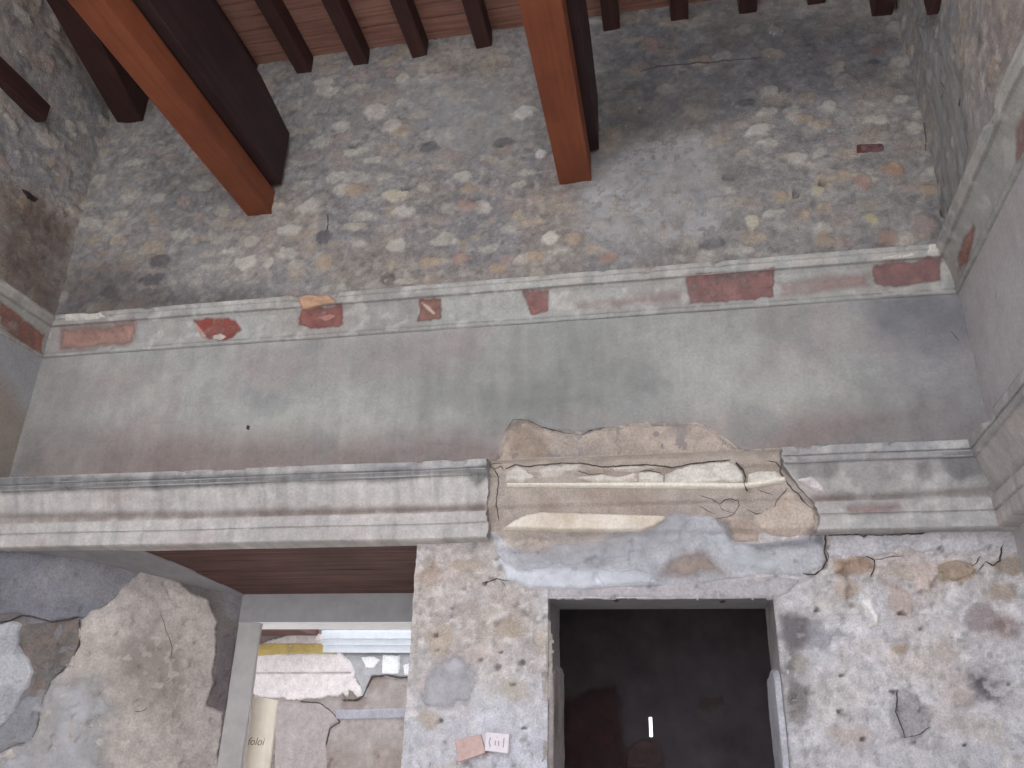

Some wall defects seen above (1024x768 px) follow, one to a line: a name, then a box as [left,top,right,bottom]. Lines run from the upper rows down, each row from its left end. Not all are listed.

spalling [499,421,781,483]
crack [490,419,812,520]
spalling [719,477,826,543]
crack [802,532,925,577]
crack [968,543,1004,570]
flaking render [0,572,235,768]
crack [895,690,929,738]